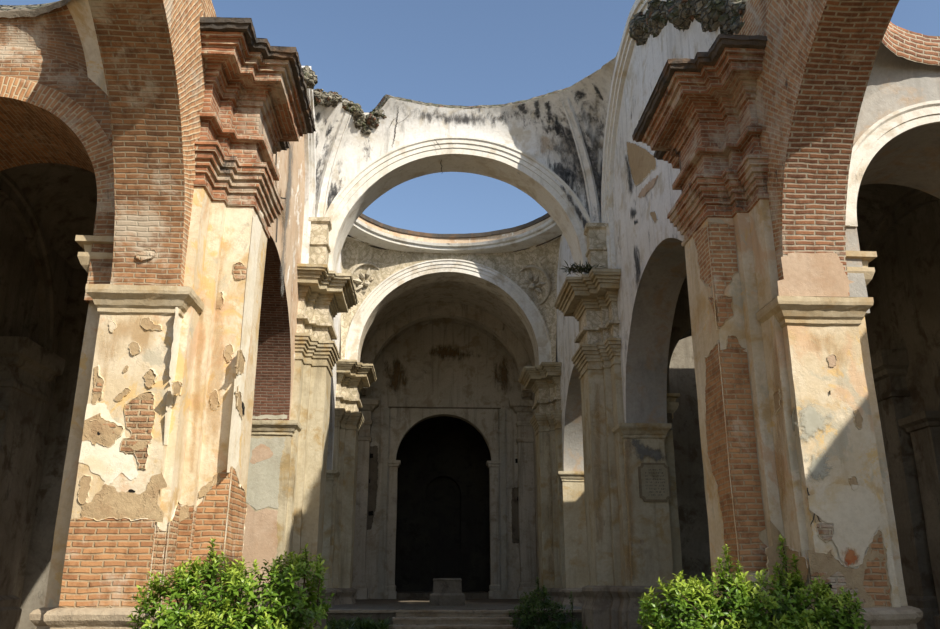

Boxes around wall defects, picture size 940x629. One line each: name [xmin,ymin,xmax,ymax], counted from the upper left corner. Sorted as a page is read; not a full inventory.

water stain [422,86,604,228]
spalling [233,262,247,281]
spalling [82,365,158,470]
peeling [223,343,245,420]
flaking render [692,222,893,611]
flaking render [59,466,247,608]